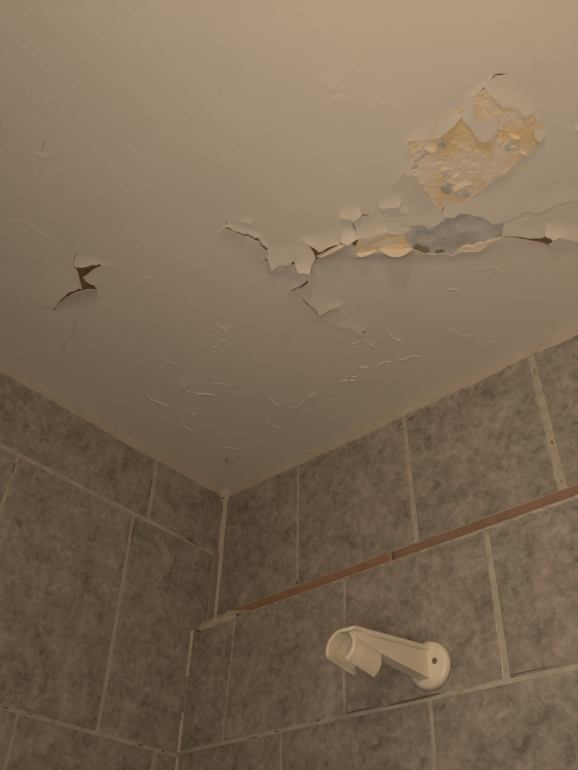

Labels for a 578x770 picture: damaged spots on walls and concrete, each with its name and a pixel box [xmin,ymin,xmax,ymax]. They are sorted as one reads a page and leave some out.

peeling [257,201,578,284]
peeling [16,253,124,317]